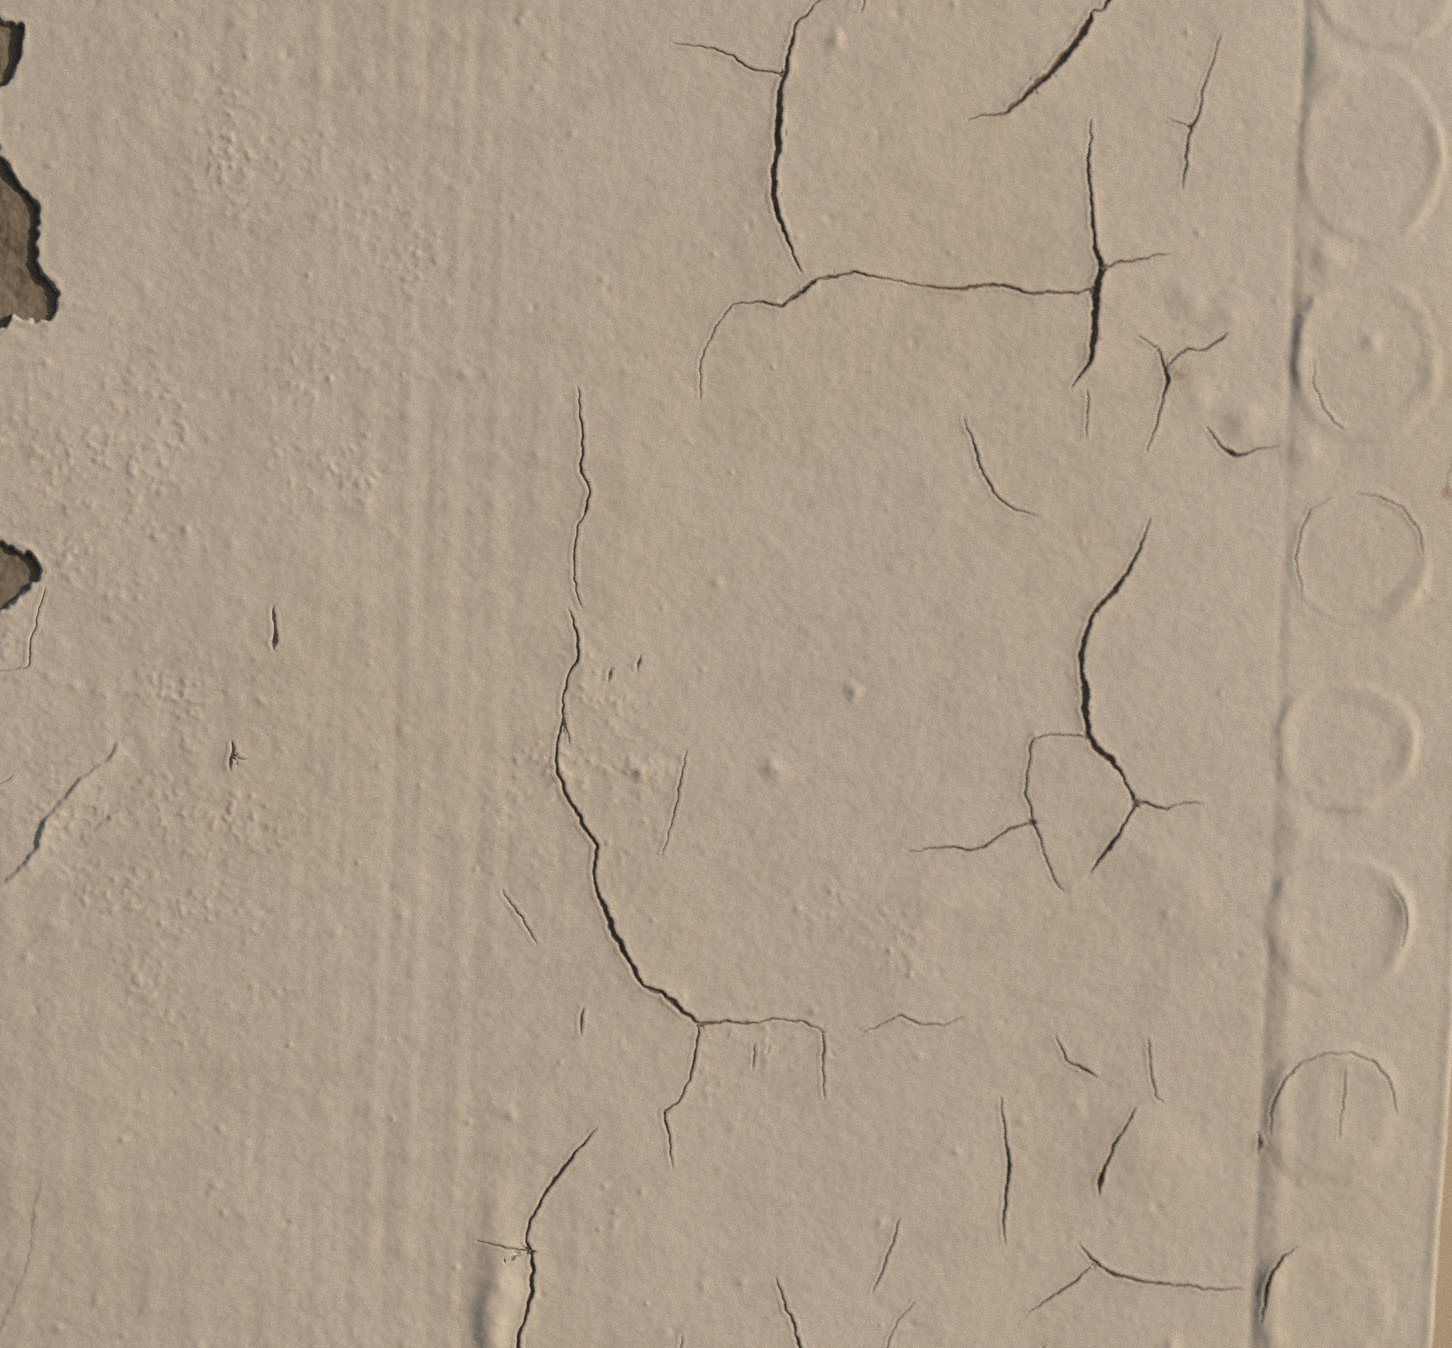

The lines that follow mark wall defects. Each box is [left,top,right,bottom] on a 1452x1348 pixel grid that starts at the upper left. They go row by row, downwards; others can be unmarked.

flaking render [0,24,24,87]
flaking render [0,159,59,327]
crack [670,0,1231,454]
crack [958,415,1039,522]
crack [1201,422,1281,463]
flaking render [0,543,40,609]
peeling [0,736,142,925]
crack [549,384,967,1168]
crack [905,515,1206,896]
crack [473,1124,602,1348]
crack [770,1275,807,1348]
crack [1023,1240,1302,1348]